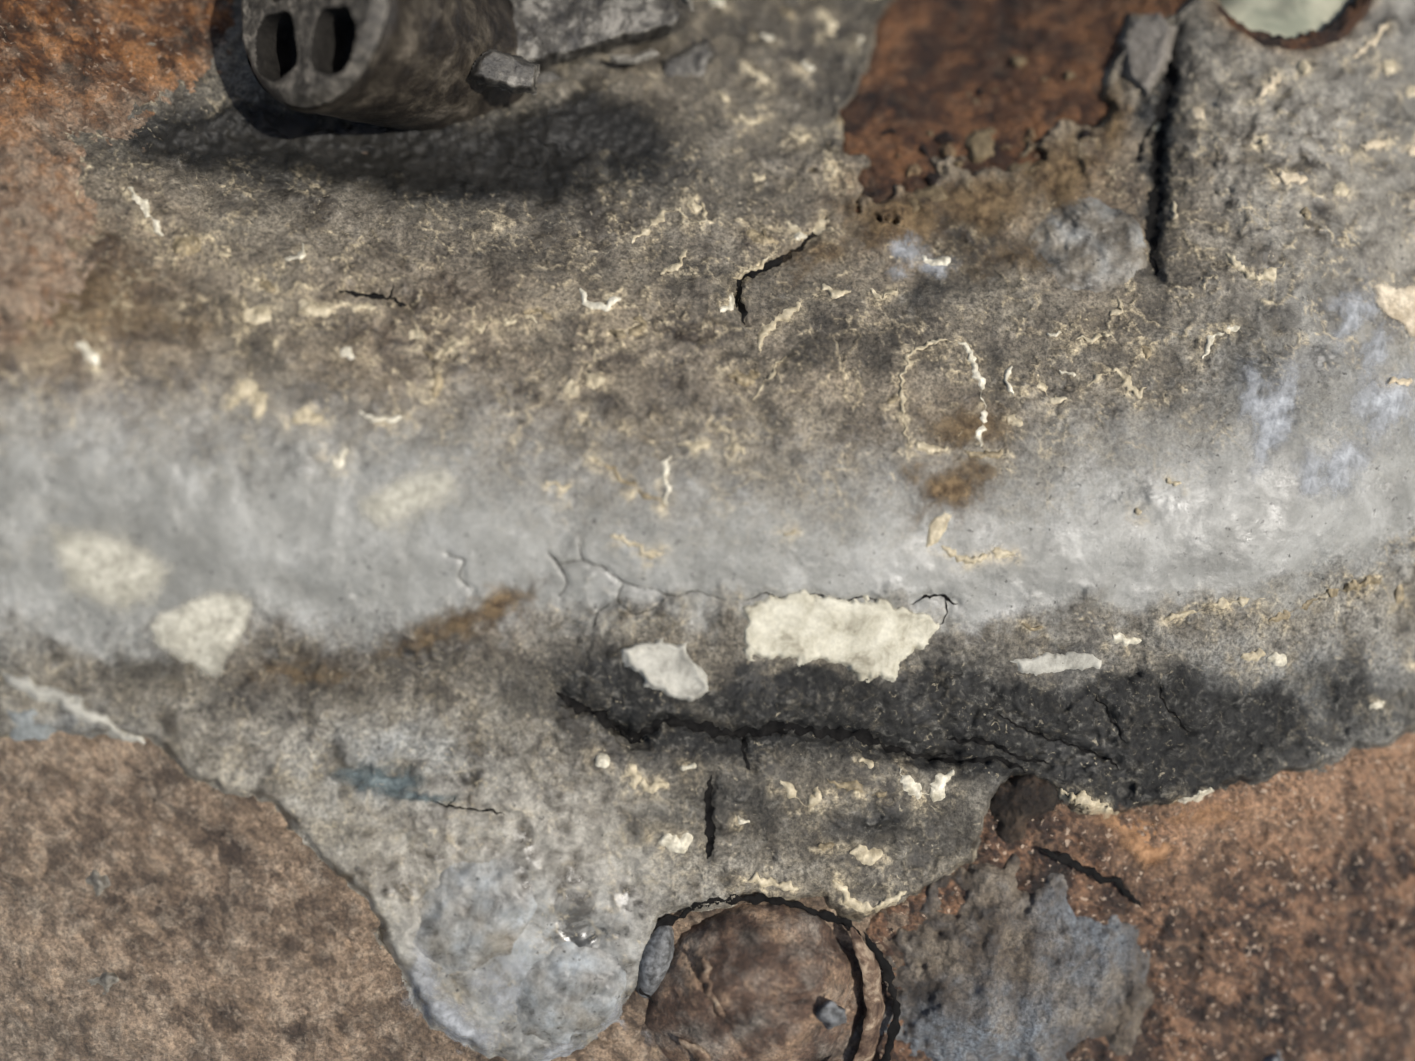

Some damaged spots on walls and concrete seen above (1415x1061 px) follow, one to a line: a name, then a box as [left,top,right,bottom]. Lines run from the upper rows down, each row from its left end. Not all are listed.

crack [1137,14,1179,275]
crack [735,217,827,325]
damp [1338,296,1376,336]
damp [1243,373,1297,459]
damp [1360,377,1414,429]
damp [1302,445,1366,494]
peeling [151,594,251,675]
peeling [621,638,709,702]
peeling [742,589,939,683]
peeling [1010,651,1102,676]
spalling [0,671,507,1061]
spalling [550,733,1415,1061]